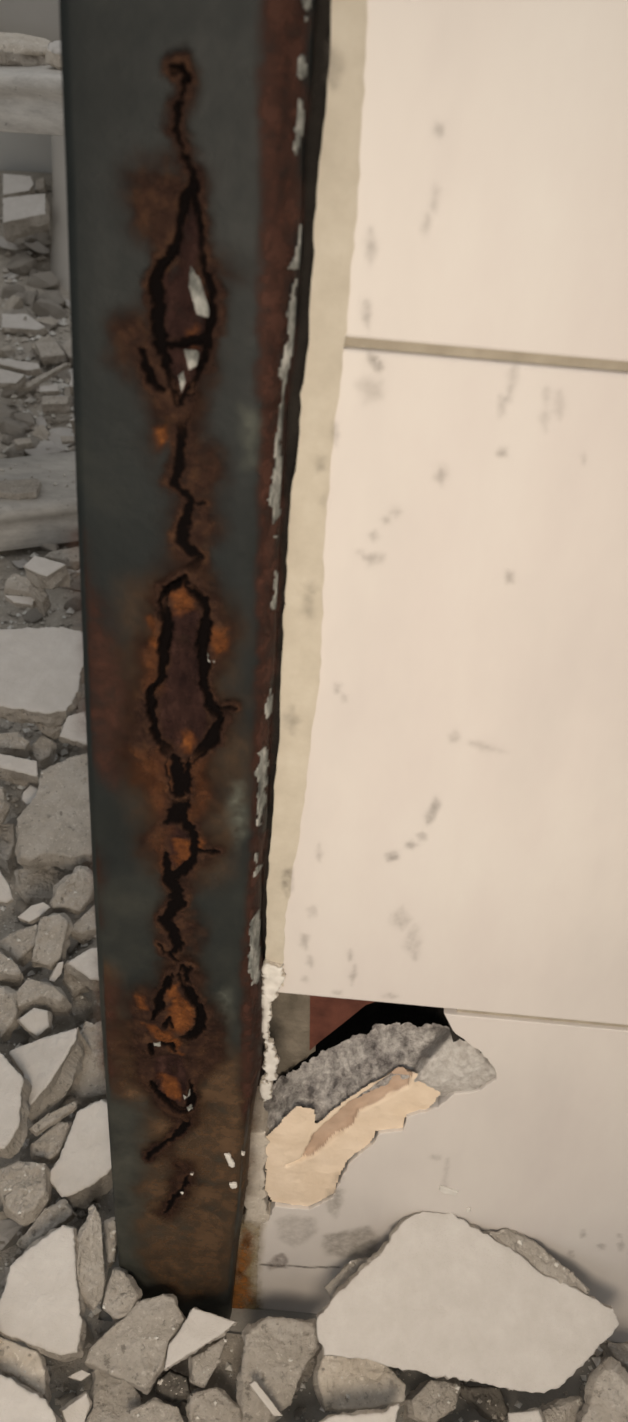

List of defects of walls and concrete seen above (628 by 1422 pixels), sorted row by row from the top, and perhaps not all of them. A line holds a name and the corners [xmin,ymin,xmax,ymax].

peeling [297,54,308,79]
peeling [293,98,305,155]
peeling [267,224,302,538]
crack [148,378,224,609]
peeling [270,570,279,610]
corrosion [103,0,307,1309]
peeling [265,688,273,719]
peeling [254,746,269,827]
crack [126,748,226,986]
peeling [253,852,263,878]
spalling [247,909,496,1206]
crack [141,1109,197,1219]